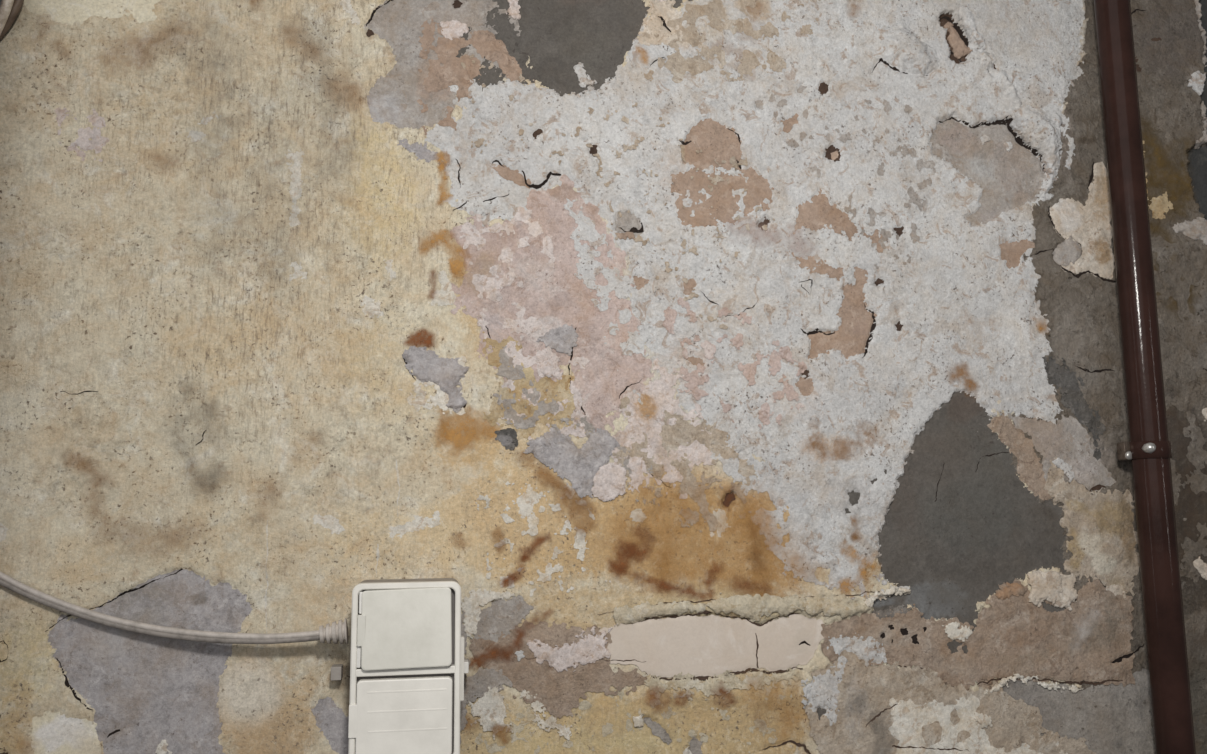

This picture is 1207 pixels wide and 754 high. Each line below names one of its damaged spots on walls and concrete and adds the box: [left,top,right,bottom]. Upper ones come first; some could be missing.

crack [939,116,1045,173]
crack [453,159,561,211]
peeling [338,0,1155,754]
peeling [1130,0,1207,754]
corrosion [441,416,497,449]
corrosion [503,537,545,586]
corrosion [611,544,647,574]
corrosion [648,567,718,598]
peeling [30,569,252,754]
peeling [311,697,349,754]